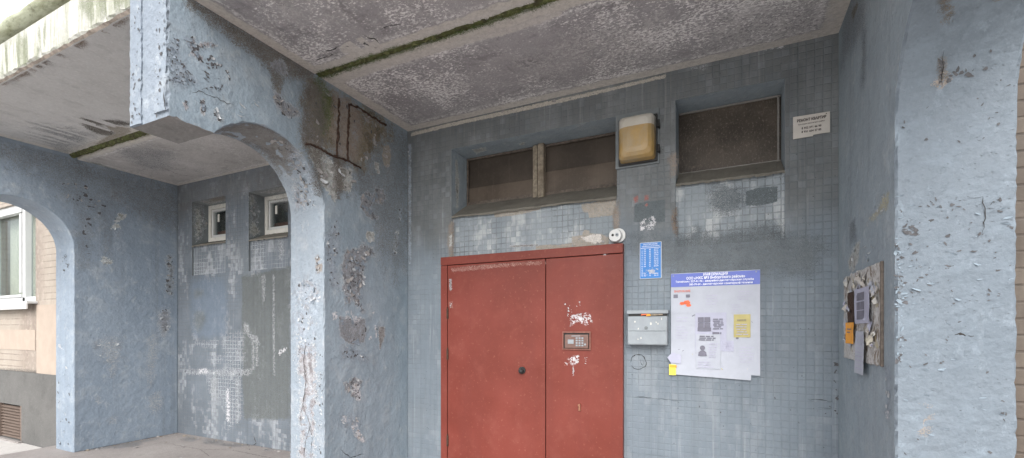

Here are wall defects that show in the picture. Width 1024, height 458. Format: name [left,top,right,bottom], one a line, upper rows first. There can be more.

water stain [19,117,188,176]
peeling [155,2,231,122]
water stain [182,0,677,200]
spalling [931,52,988,89]
peeling [290,218,385,363]